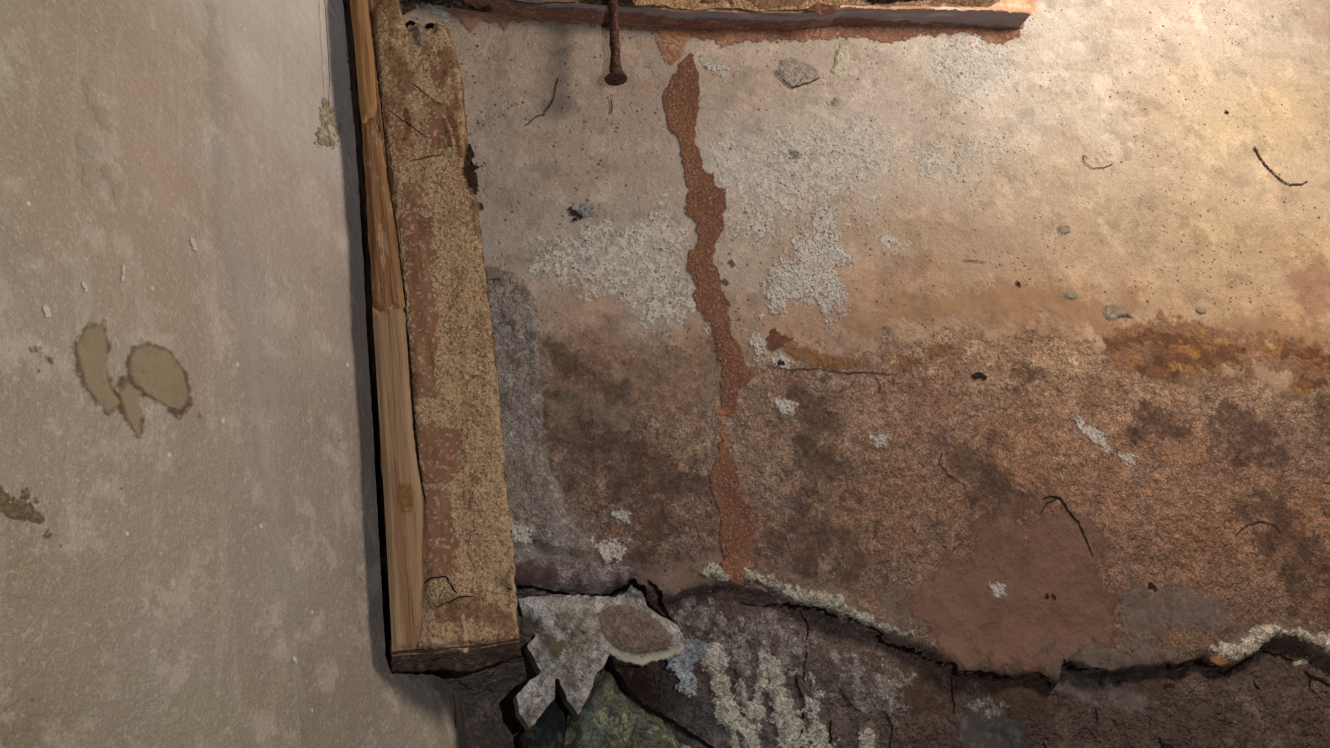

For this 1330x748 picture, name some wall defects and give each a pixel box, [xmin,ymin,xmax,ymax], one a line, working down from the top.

water stain [75,324,193,438]
corrosion [443,7,1024,588]
water stain [529,111,1330,748]
corrosion [1103,310,1330,396]
crack [607,656,714,748]
spalling [436,562,1330,748]